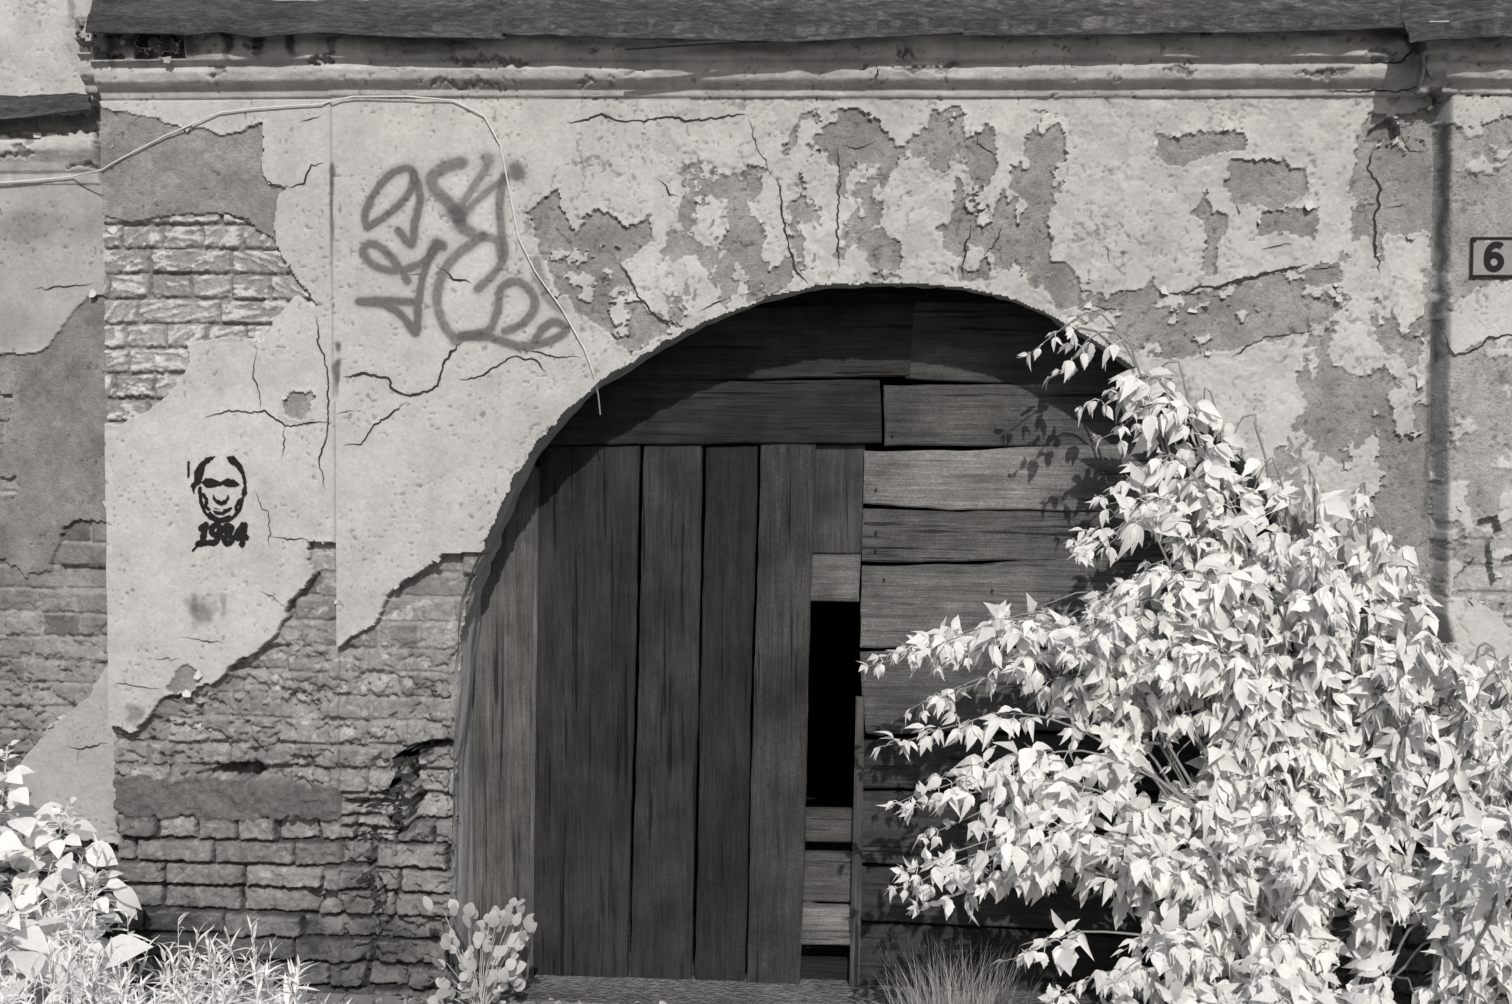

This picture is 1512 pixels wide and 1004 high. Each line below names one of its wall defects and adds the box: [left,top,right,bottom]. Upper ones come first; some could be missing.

spalling [73,16,186,71]
crack [1327,50,1434,96]
crack [1367,136,1429,271]
crack [1168,243,1337,295]
crack [1234,329,1314,356]
crack [207,321,580,490]
peeling [525,92,1512,785]
spalling [0,105,483,998]
spalling [1389,806,1444,871]
spalling [1328,871,1367,993]
spalling [1382,901,1433,1004]
spalling [1492,970,1512,1004]